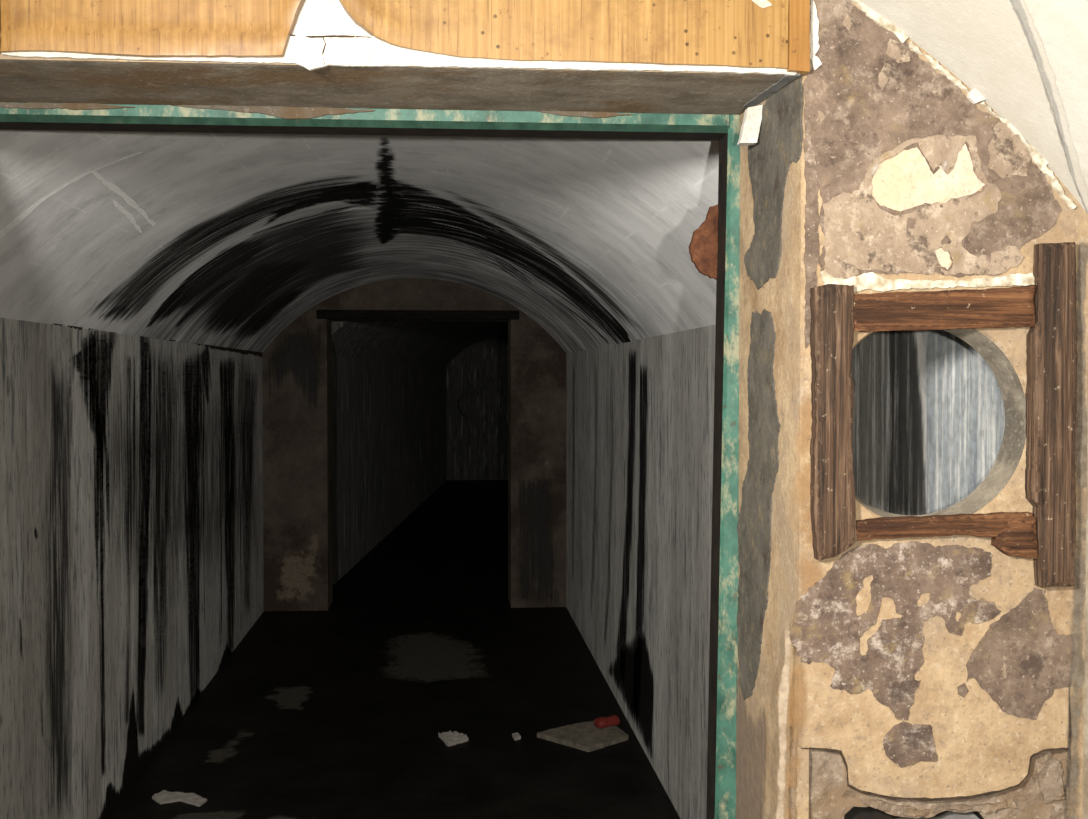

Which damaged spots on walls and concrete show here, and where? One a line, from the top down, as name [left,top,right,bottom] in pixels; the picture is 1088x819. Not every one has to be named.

peeling [0,0,1076,348]
spalling [1024,0,1088,189]
water stain [41,139,653,819]
peeling [736,309,781,819]
spalling [789,742,1069,819]
peeling [789,541,1075,768]